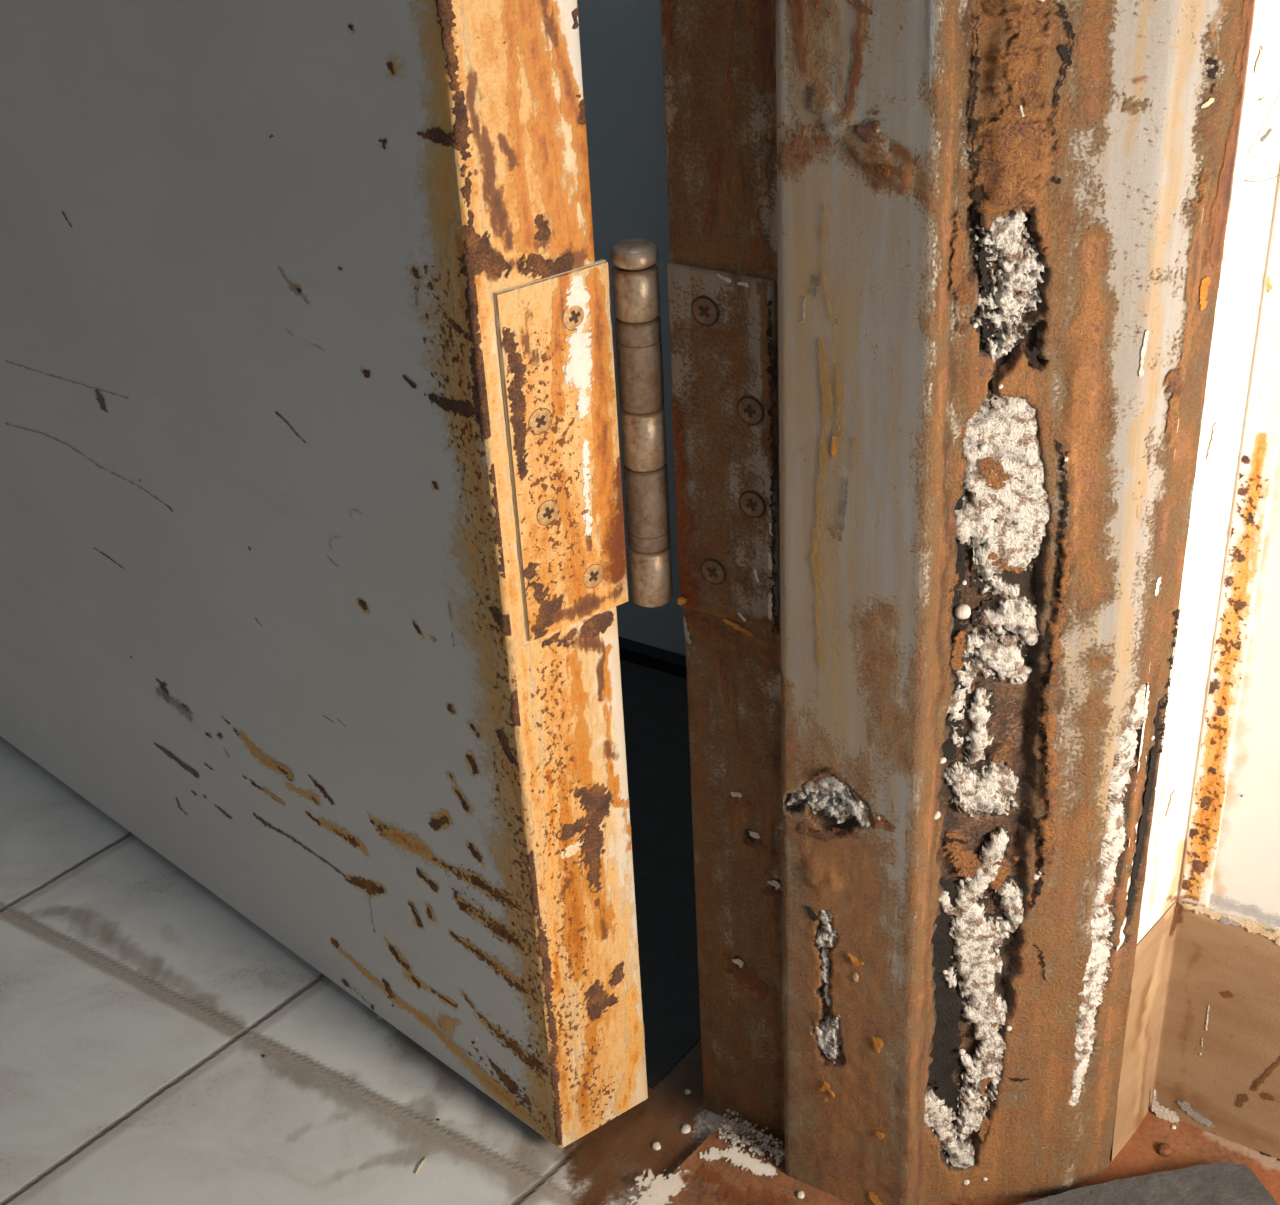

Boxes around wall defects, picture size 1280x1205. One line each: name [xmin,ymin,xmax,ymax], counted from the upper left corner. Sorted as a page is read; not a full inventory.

rust [703,0,775,235]
rust [777,0,934,213]
rust [950,0,1075,335]
rust [1163,0,1256,447]
rust [330,0,709,1205]
rust [1170,433,1270,936]
peeling [1179,901,1280,946]